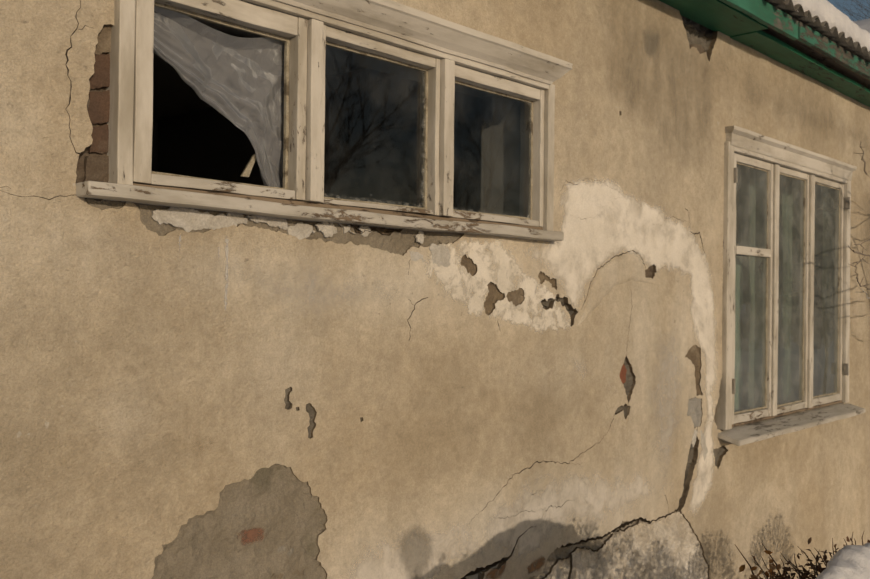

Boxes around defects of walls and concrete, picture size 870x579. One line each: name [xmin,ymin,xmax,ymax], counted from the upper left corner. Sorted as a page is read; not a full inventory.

crack [65,0,92,154]
flaking render [76,24,114,183]
flaking render [681,15,718,61]
flaking render [85,198,477,276]
flaking render [484,282,525,315]
flaking render [538,271,578,326]
crack [581,250,646,310]
flaking render [151,464,327,579]
crack [460,418,614,579]
flaking render [528,345,710,579]
crack [561,495,678,579]
crack [691,420,715,461]